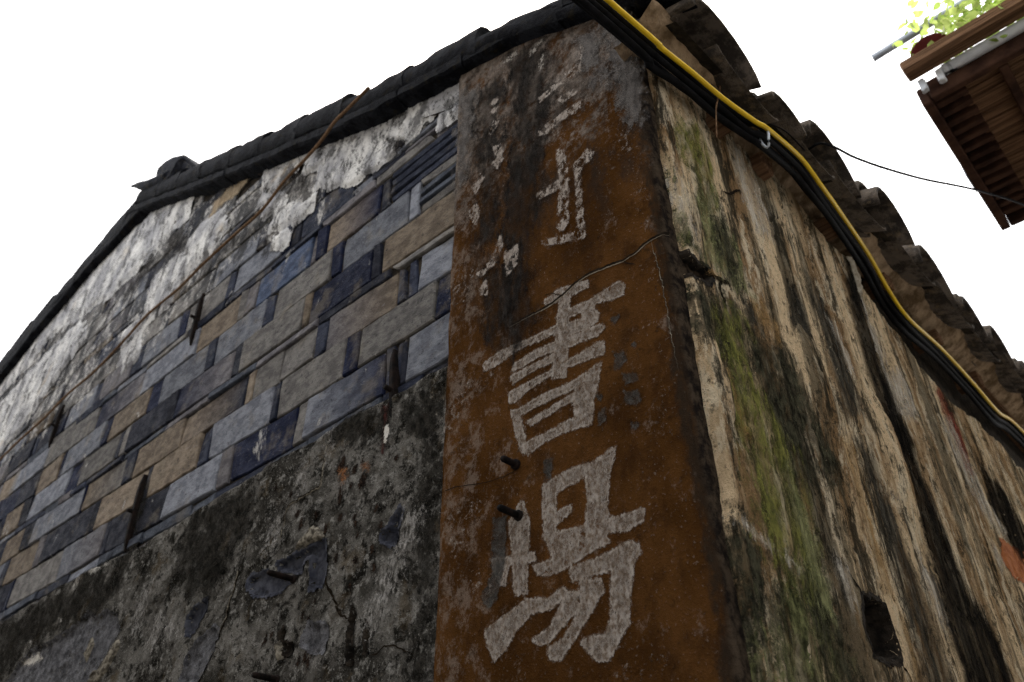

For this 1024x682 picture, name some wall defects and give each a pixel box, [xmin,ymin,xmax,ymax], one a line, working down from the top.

peeling [570,23,647,132]
peeling [257,83,478,252]
corrosion [378,402,389,453]
damp [662,114,1024,682]
damp [0,485,147,679]
damp [171,484,256,606]
spalling [245,454,405,669]
spalling [860,590,904,669]